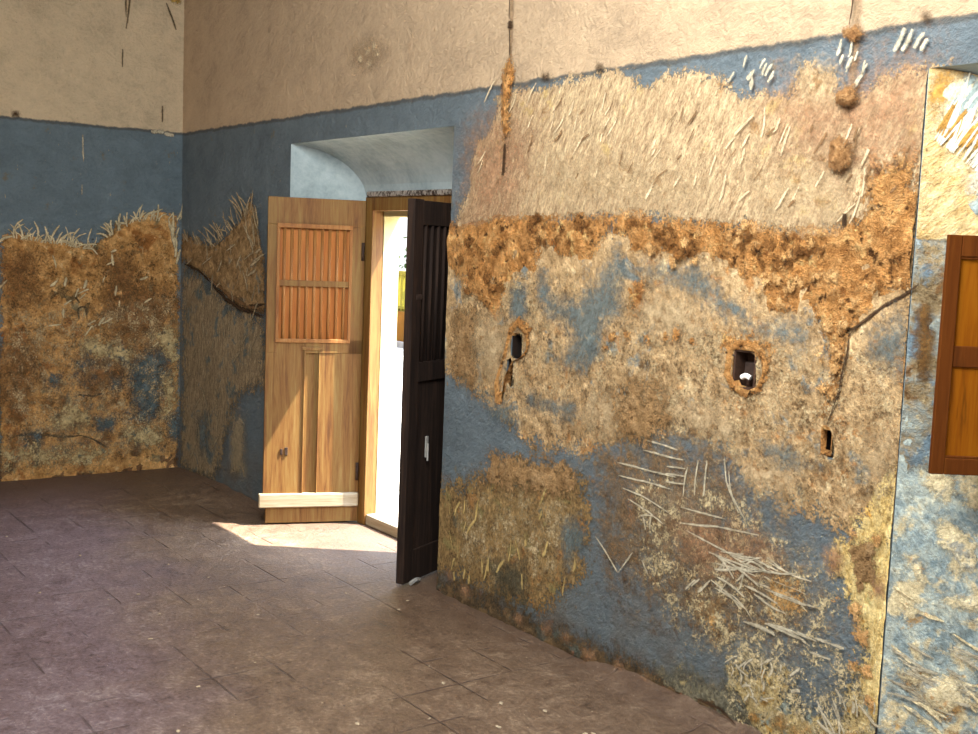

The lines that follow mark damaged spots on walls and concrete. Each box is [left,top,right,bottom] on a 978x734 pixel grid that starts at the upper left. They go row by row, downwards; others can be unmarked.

crack [505,0,513,55]
crack [500,144,508,175]
flaking render [0,204,266,482]
crack [185,264,265,317]
flaking render [436,52,978,734]
crack [827,284,919,425]